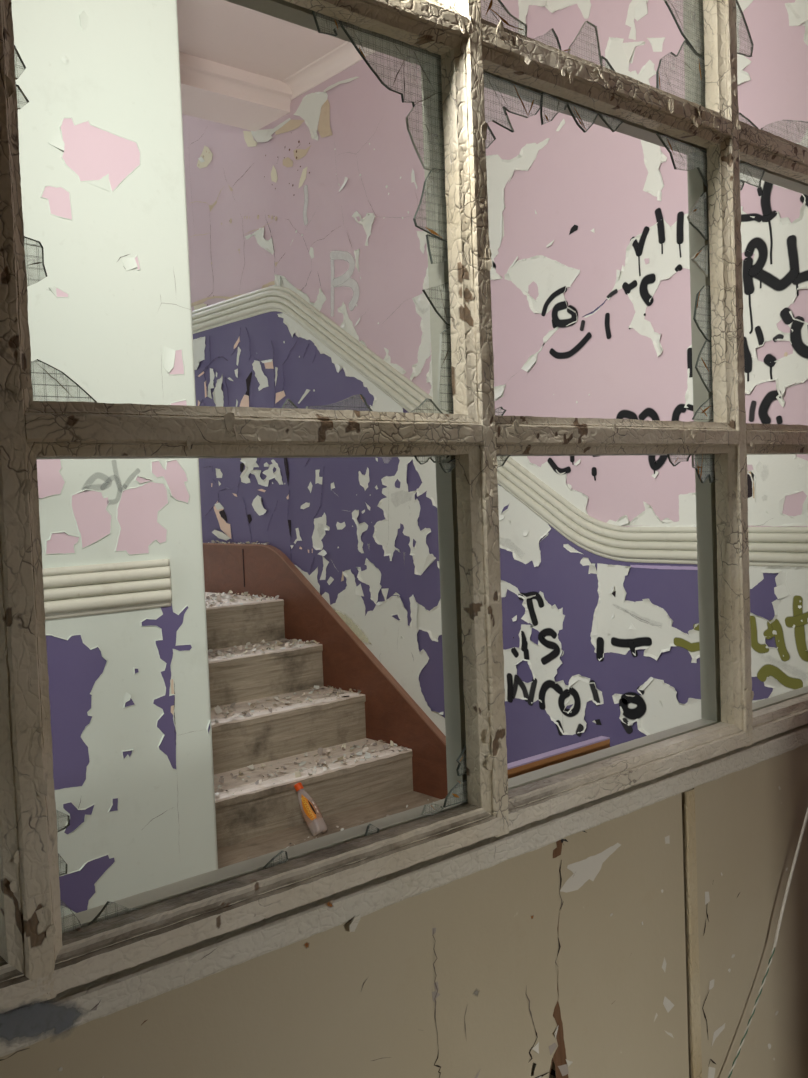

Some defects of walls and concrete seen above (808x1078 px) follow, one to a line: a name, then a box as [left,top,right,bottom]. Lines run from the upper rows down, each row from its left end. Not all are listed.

peeling [476,119,690,414]
peeling [735,173,808,407]
peeling [21,459,190,556]
peeling [745,442,808,538]
peeling [31,634,108,836]
peeling [140,602,193,770]
peeling [294,457,446,736]
peeling [501,580,701,735]
peeling [563,544,700,663]
crack [555,860,563,966]
crack [432,928,441,1078]
crack [526,987,573,1078]